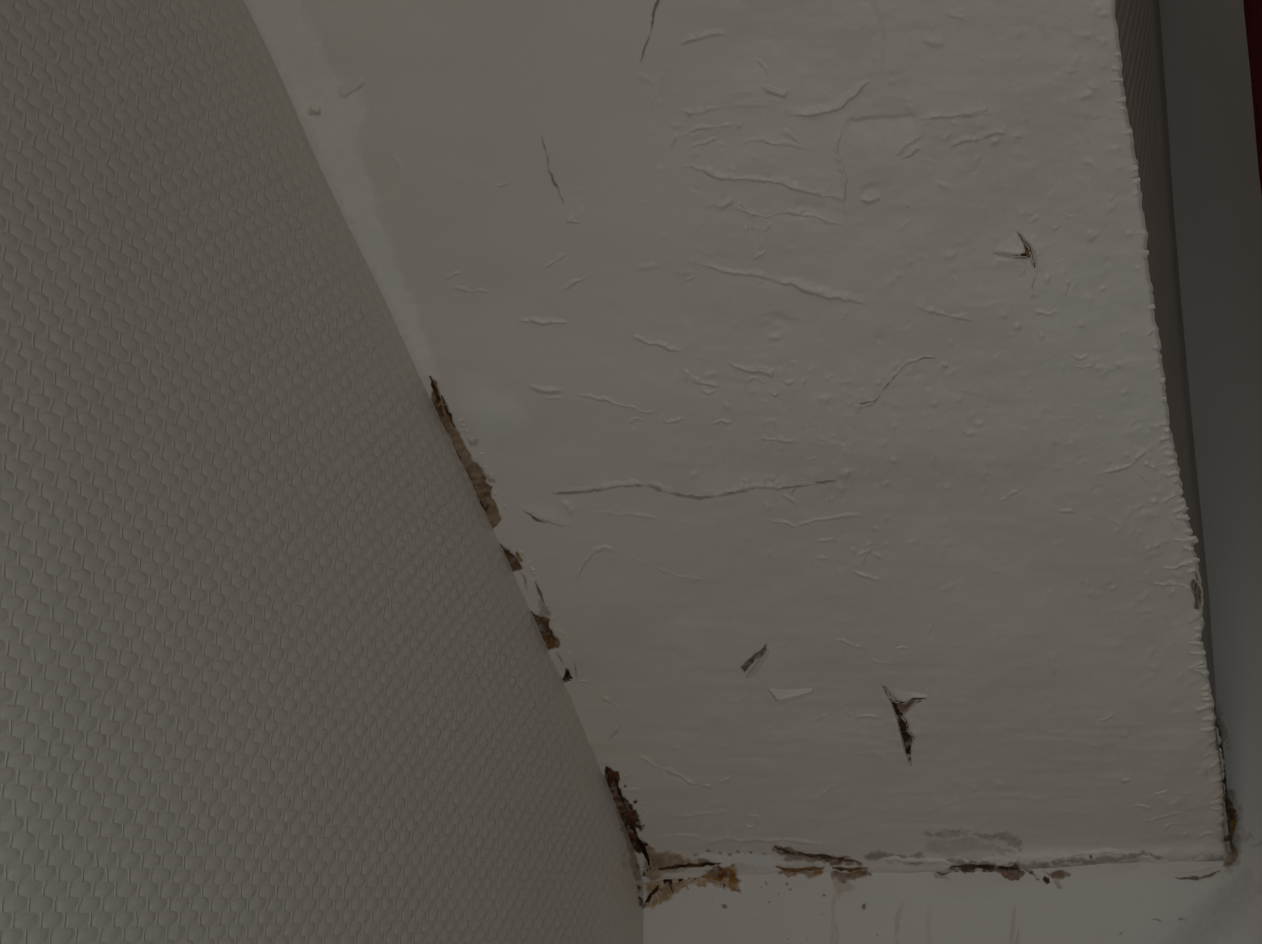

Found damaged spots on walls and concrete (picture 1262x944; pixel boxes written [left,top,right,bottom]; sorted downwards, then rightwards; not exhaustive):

flaking render [740,643,768,673]
spalling [641,832,873,910]
spalling [933,862,1071,889]